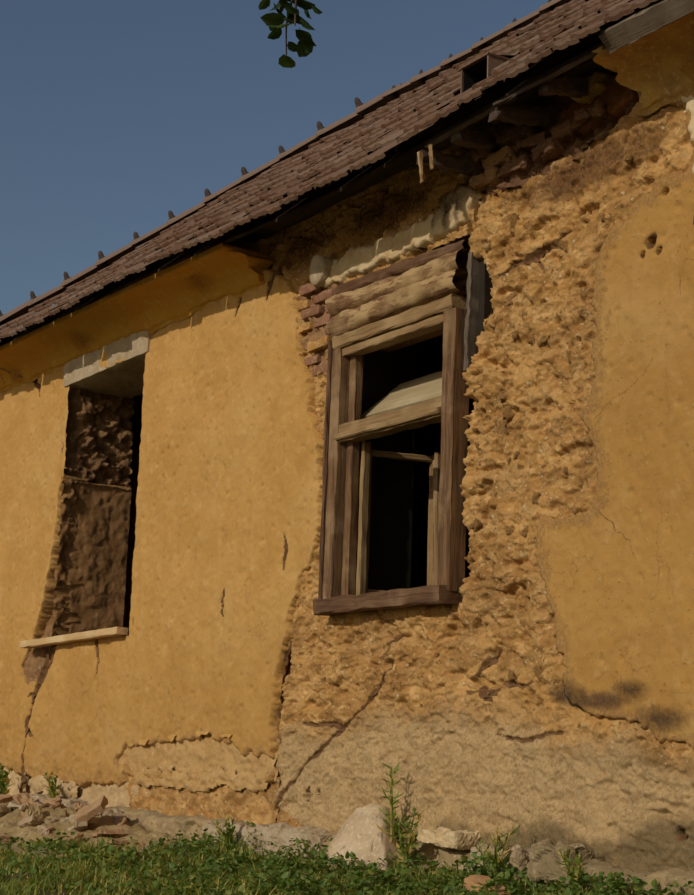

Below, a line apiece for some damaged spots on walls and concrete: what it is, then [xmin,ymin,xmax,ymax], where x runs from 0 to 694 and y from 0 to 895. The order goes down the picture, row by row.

spalling [64,92,694,870]
crack [281,535,289,570]
crack [219,589,227,617]
crack [19,646,56,793]
spalling [24,617,53,684]
crack [93,640,101,676]
crack [275,634,404,814]
crack [467,649,534,702]
crack [495,730,563,743]
leakage [555,684,639,706]
spalling [0,767,44,795]
leakage [277,715,694,872]